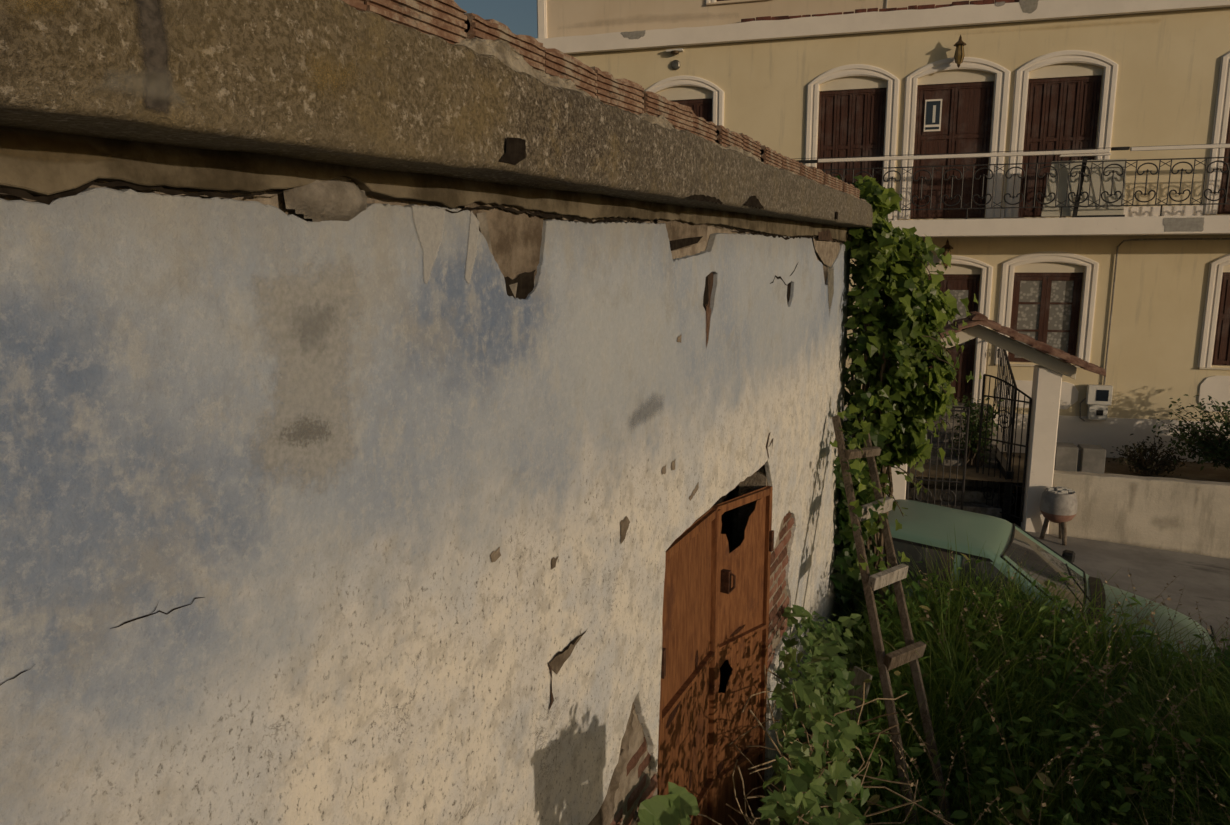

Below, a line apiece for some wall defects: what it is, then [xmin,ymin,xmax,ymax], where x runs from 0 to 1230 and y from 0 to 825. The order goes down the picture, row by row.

peeling [413,206,445,283]
spalling [465,202,543,299]
spalling [658,219,708,251]
spalling [703,272,714,311]
spalling [620,516,630,543]
crack [110,597,204,629]
spalling [767,513,794,670]
spalling [547,630,587,719]
spalling [588,702,658,825]